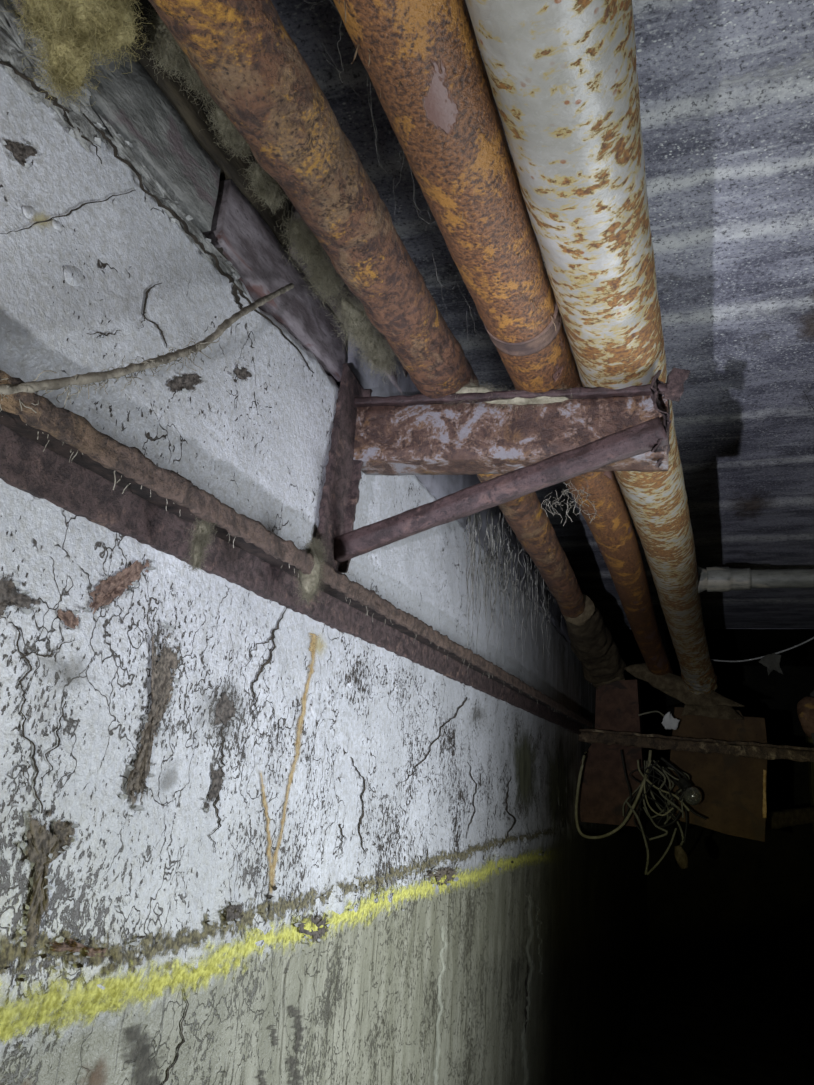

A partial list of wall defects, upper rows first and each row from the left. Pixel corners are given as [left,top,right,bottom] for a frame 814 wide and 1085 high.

crack [0,61,314,373]
peeling [0,574,41,619]
crack [16,626,75,814]
peeling [58,559,156,630]
crack [240,607,287,715]
corrosion [260,633,323,893]
crack [339,757,366,859]
crack [397,697,477,839]
water stain [125,1026,161,1085]
water stain [0,850,553,1043]
water stain [287,1005,304,1085]
water stain [434,927,448,1085]